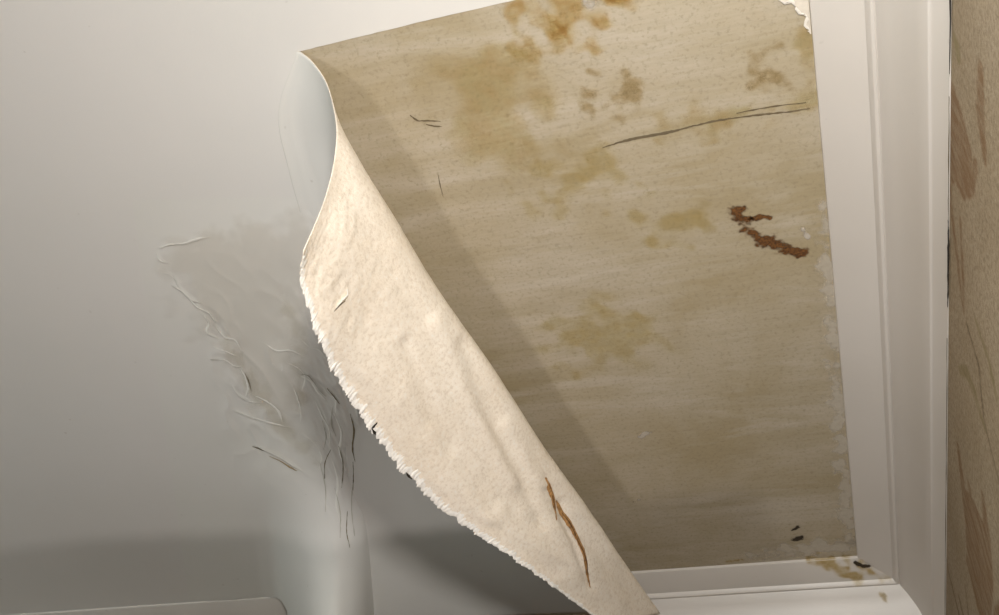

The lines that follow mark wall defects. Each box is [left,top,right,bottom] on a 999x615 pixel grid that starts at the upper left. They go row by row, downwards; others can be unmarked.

crack [602,102,810,148]
corrosion [731,206,808,258]